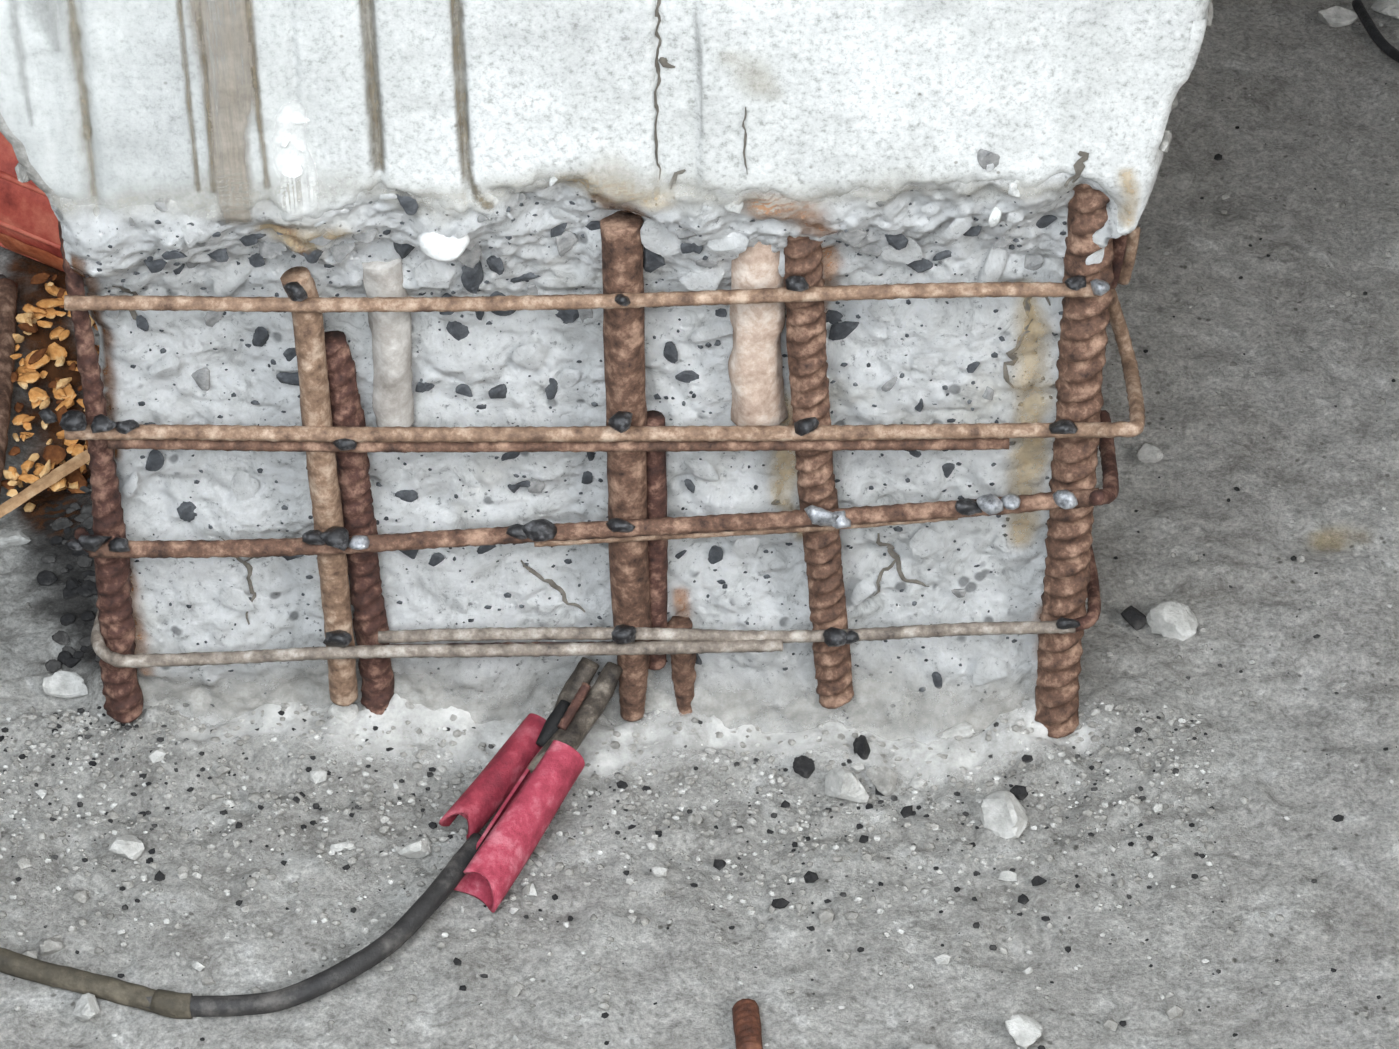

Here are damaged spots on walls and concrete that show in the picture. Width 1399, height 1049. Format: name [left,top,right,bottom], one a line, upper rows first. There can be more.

corrosion [260,224,341,250]
corrosion [564,179,647,217]
corrosion [750,199,836,285]
corrosion [71,255,114,421]
spalling [0,1,1213,744]
corrosion [1016,305,1045,495]
crack [874,533,929,596]